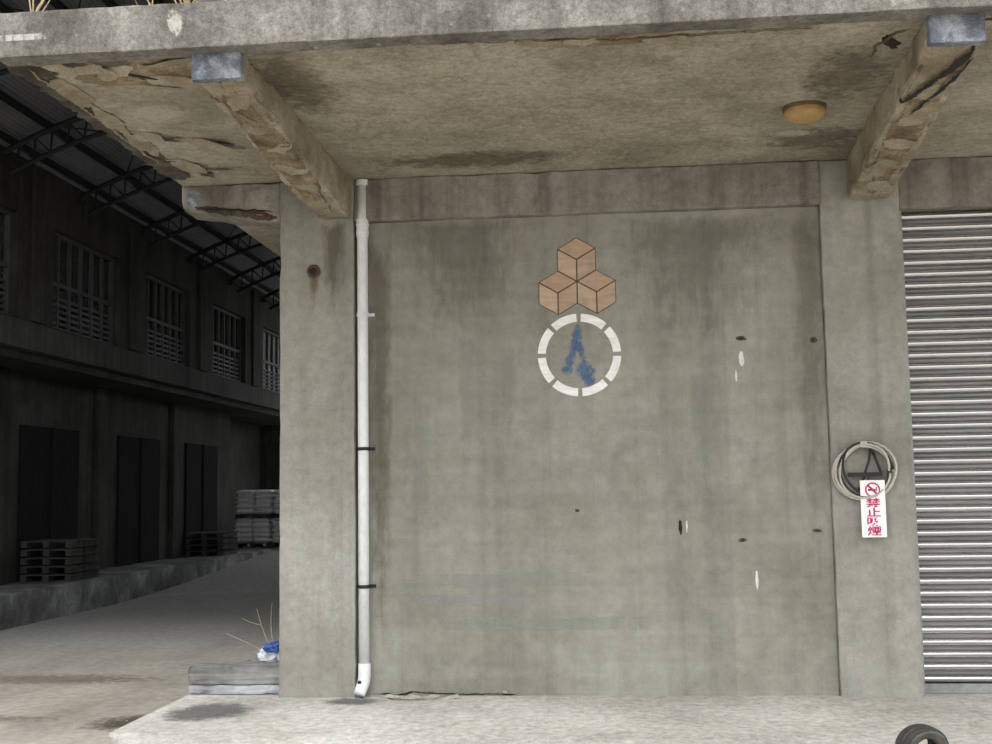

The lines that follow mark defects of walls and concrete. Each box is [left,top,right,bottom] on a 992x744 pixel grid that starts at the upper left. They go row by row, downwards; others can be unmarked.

spalling [6,57,333,210]
leakage [396,153,543,168]
spalling [862,45,975,194]